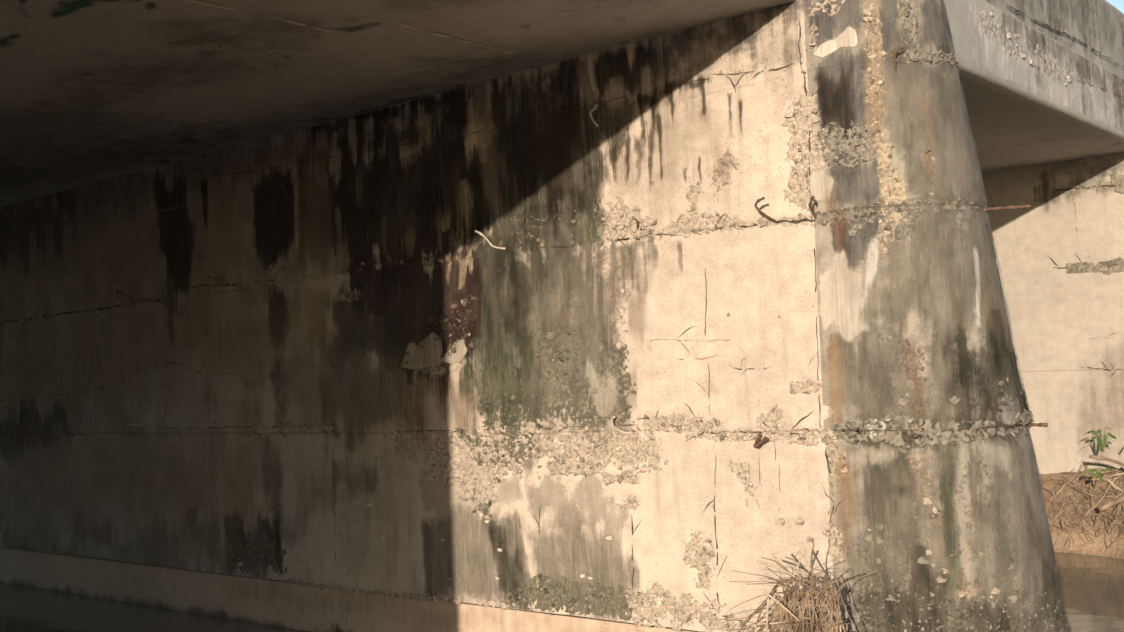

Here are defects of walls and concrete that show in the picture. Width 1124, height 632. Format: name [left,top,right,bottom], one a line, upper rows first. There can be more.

water stain [969,0,1124,130]
water stain [154,163,208,348]
water stain [253,154,294,270]
water stain [268,288,288,342]
water stain [303,0,1068,632]
spalling [414,0,1074,632]
water stain [1035,160,1115,208]
spalling [287,530,749,632]